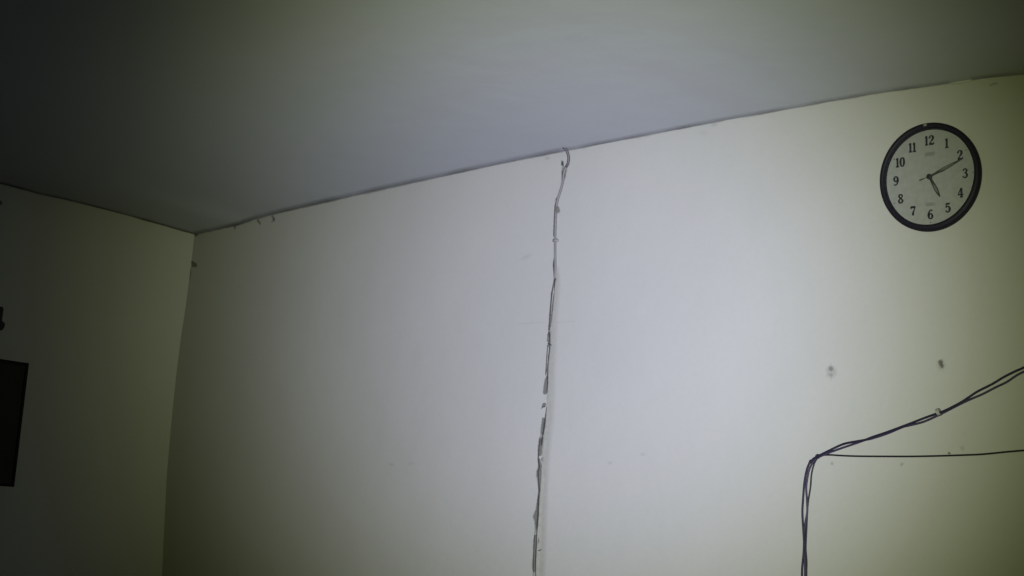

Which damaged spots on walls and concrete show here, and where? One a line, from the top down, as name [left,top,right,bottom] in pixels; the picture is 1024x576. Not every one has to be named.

crack [533,198,560,573]